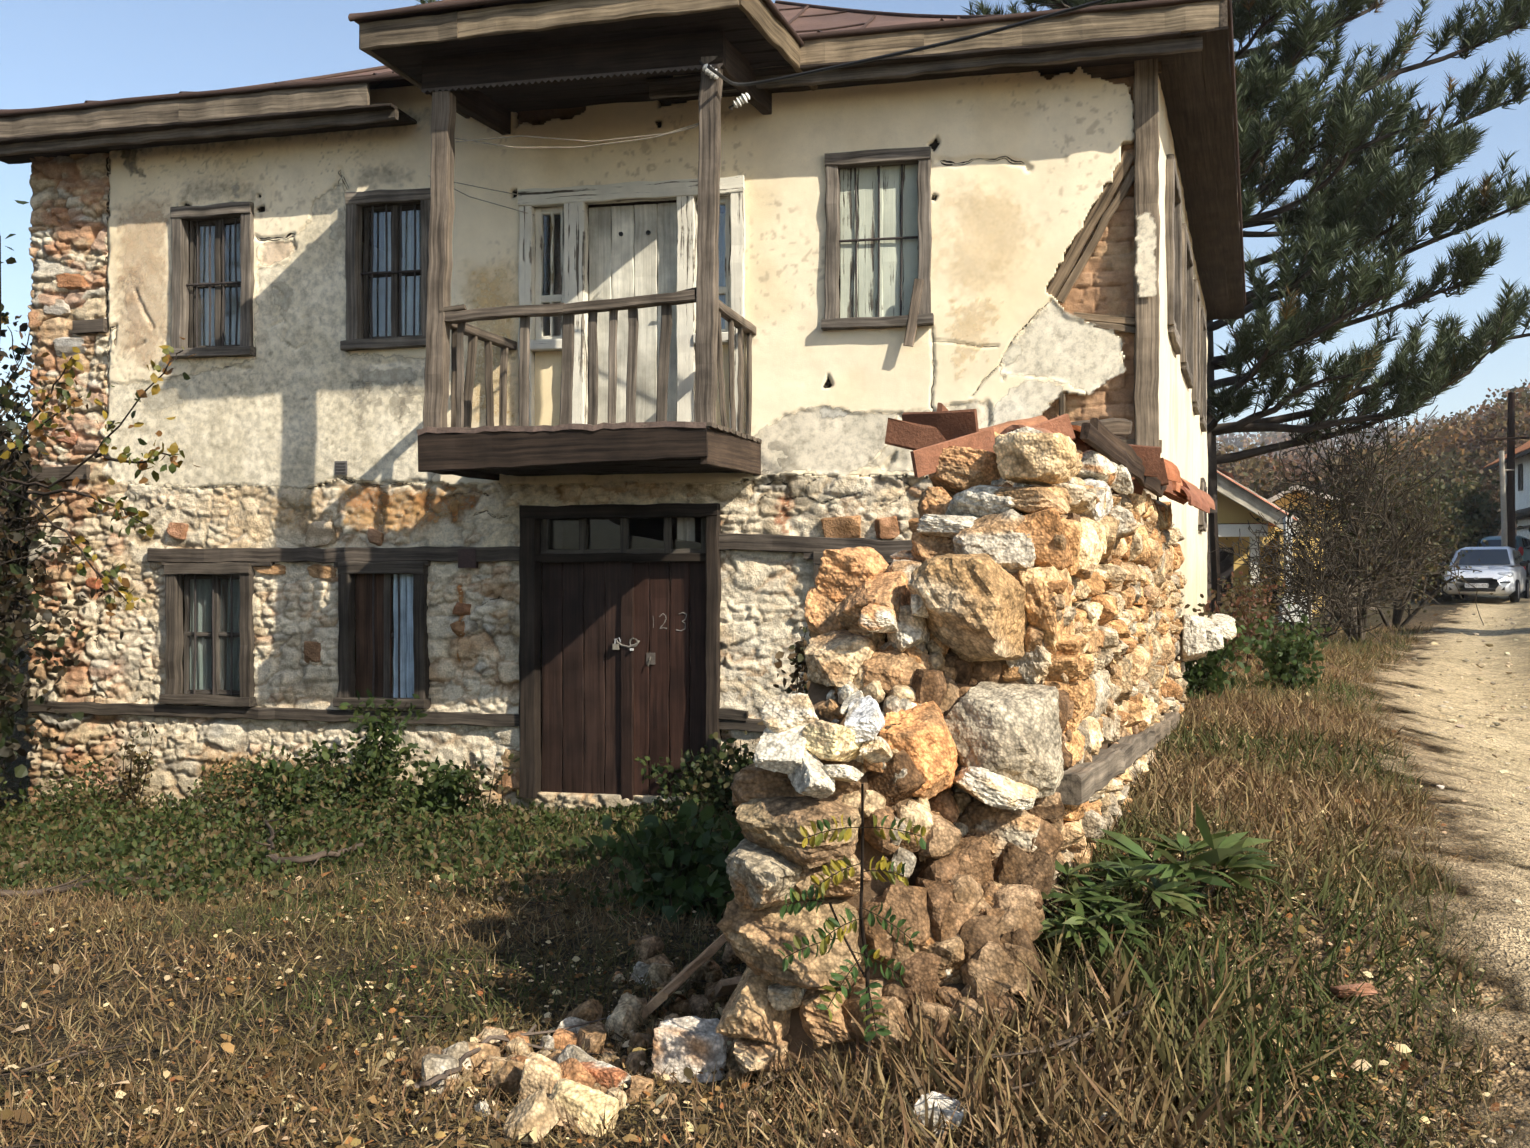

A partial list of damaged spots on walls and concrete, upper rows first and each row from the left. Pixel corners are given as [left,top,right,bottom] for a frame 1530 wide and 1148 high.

crack [940,156,1028,170]
flaking render [924,301,1125,429]
flaking render [754,406,913,477]